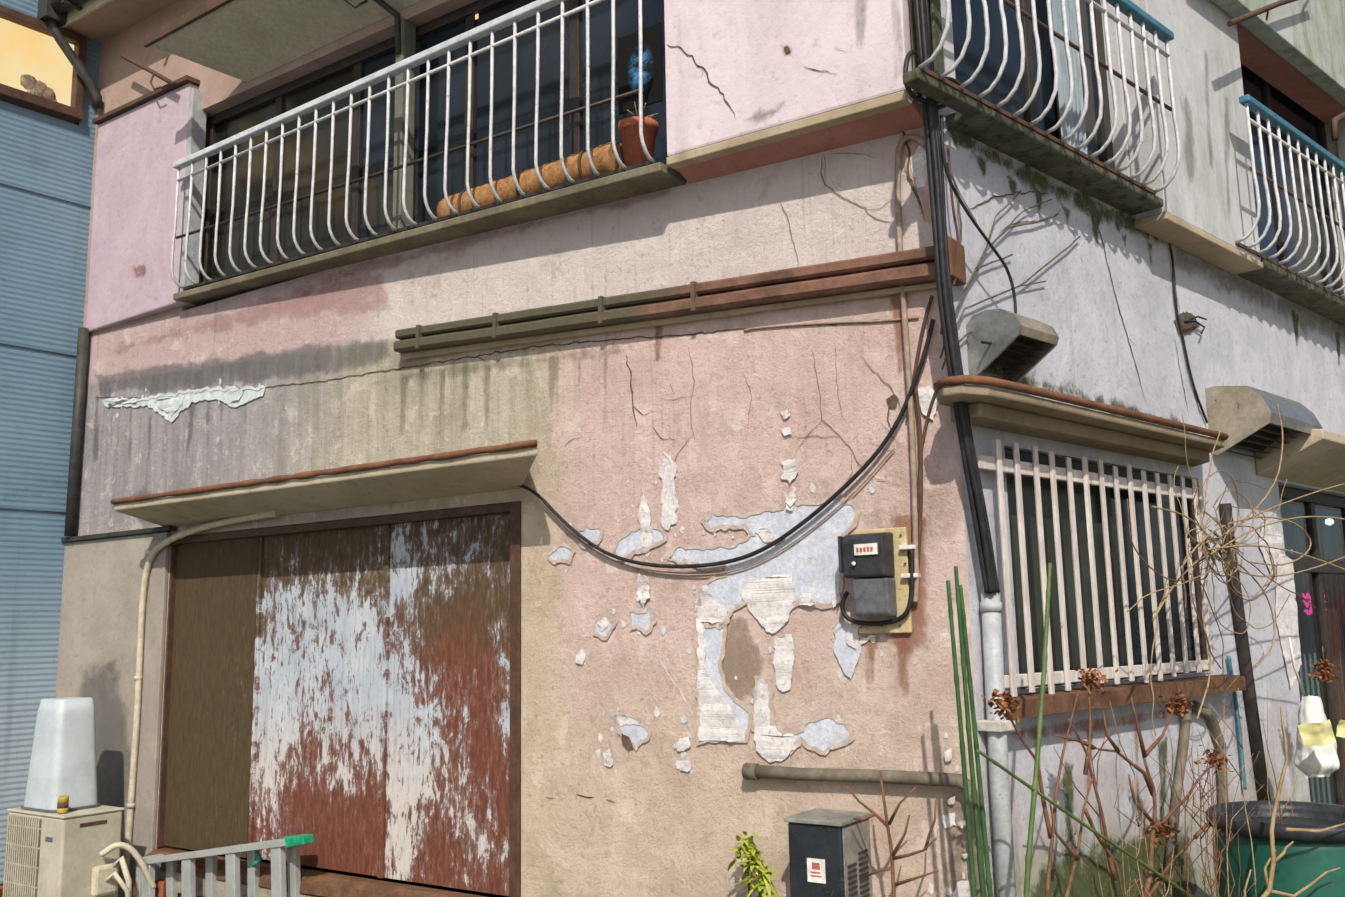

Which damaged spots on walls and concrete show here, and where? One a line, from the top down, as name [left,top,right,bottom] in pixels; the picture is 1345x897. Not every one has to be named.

crack [667,44,735,117]
crack [820,153,894,223]
crack [779,202,798,260]
water stain [1092,217,1100,244]
peeling [102,379,265,422]
crack [265,328,748,462]
crack [787,319,905,485]
peeling [539,451,860,774]
peeling [833,622,884,679]
peeling [937,796,966,829]
water stain [1063,764,1073,865]
peeling [928,853,971,897]